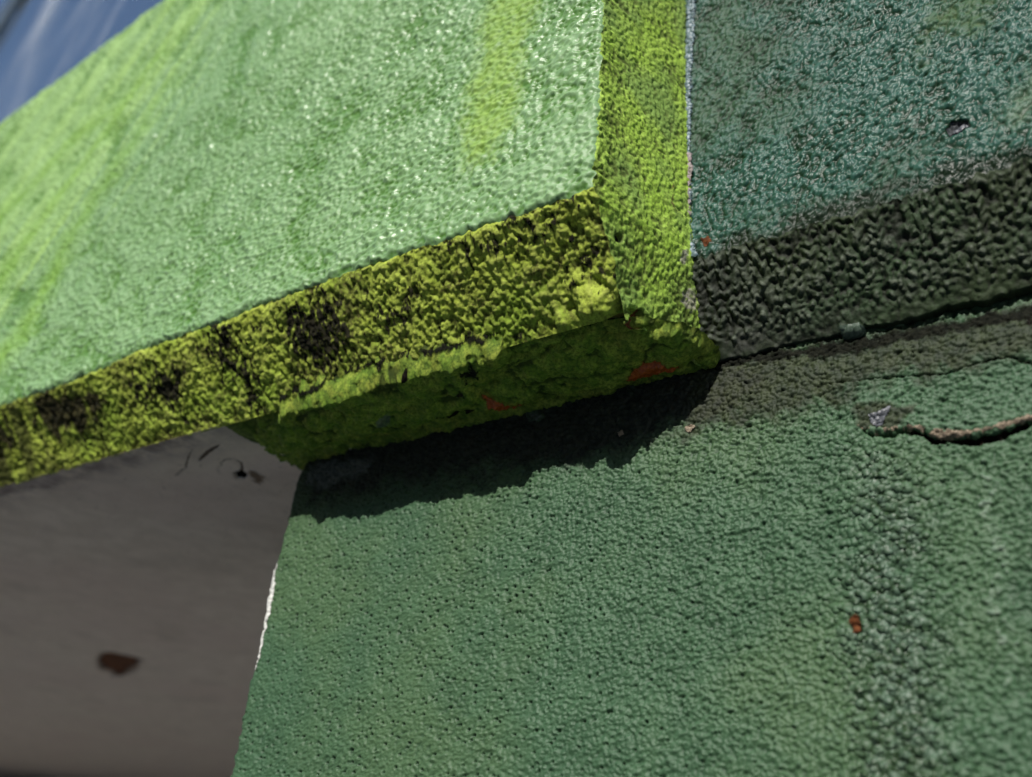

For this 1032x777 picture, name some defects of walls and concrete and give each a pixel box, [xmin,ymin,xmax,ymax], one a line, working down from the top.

leakage [0,16,215,391]
leakage [443,193,616,291]
leakage [354,272,440,341]
leakage [0,409,17,465]
leakage [31,385,110,443]
leakage [115,347,189,431]
leakage [189,284,366,415]
leakage [373,350,410,384]
leakage [293,373,713,522]
crack [858,414,1032,447]